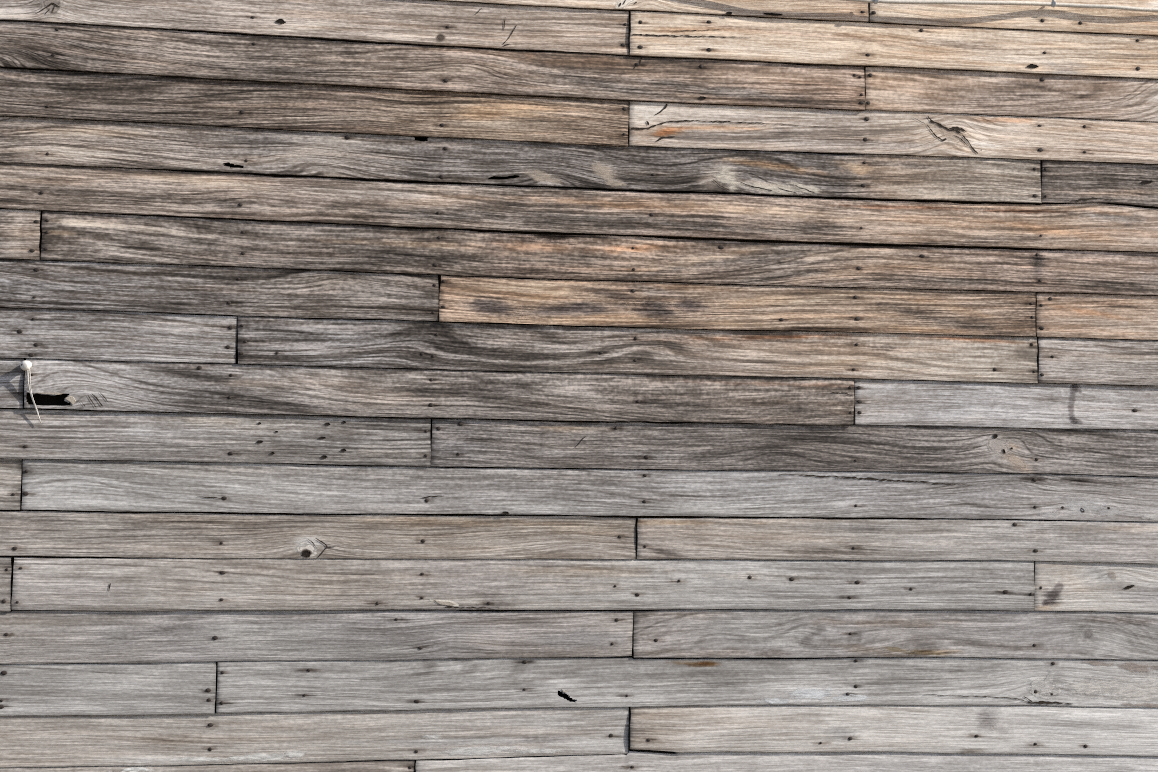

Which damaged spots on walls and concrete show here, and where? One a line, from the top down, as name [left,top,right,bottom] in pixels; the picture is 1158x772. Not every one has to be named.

crack [632,29,750,68]
crack [631,103,826,142]
crack [915,116,982,154]